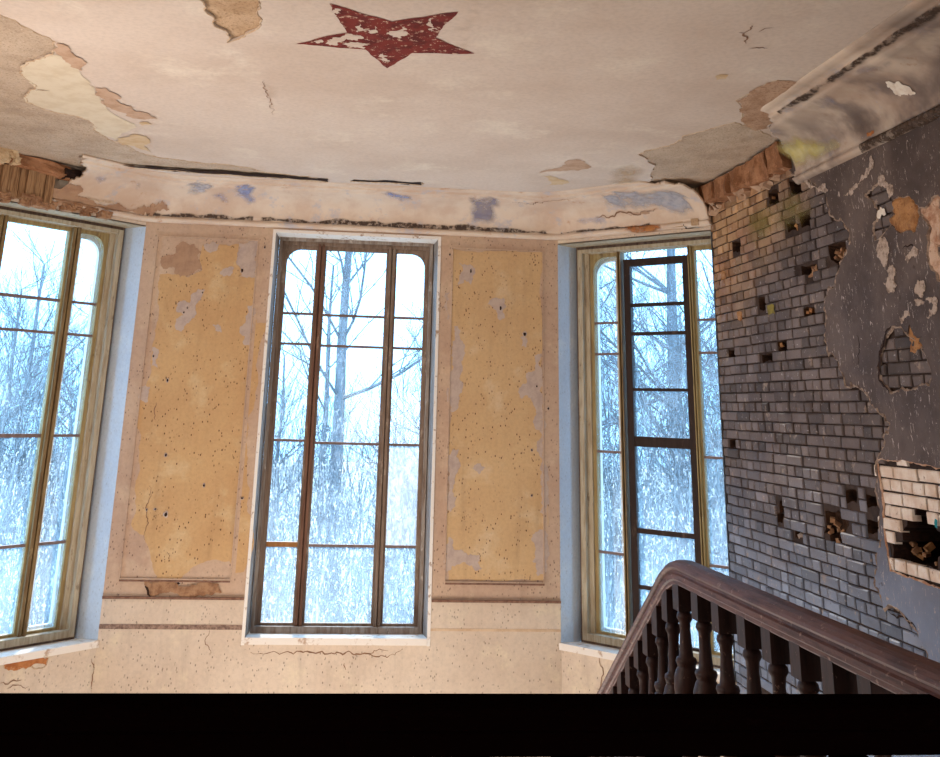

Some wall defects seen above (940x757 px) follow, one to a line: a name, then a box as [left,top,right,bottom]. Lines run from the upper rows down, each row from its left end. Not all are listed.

spalling [200,0,263,43]
spalling [0,15,318,181]
spalling [637,80,797,193]
crack [124,165,424,186]
peeling [53,184,169,216]
crack [598,210,654,218]
flaking render [668,156,940,658]
spalling [3,657,49,671]
crack [251,649,401,670]
flaking render [734,634,747,694]
flaking render [759,650,772,693]
flaking render [786,665,800,694]